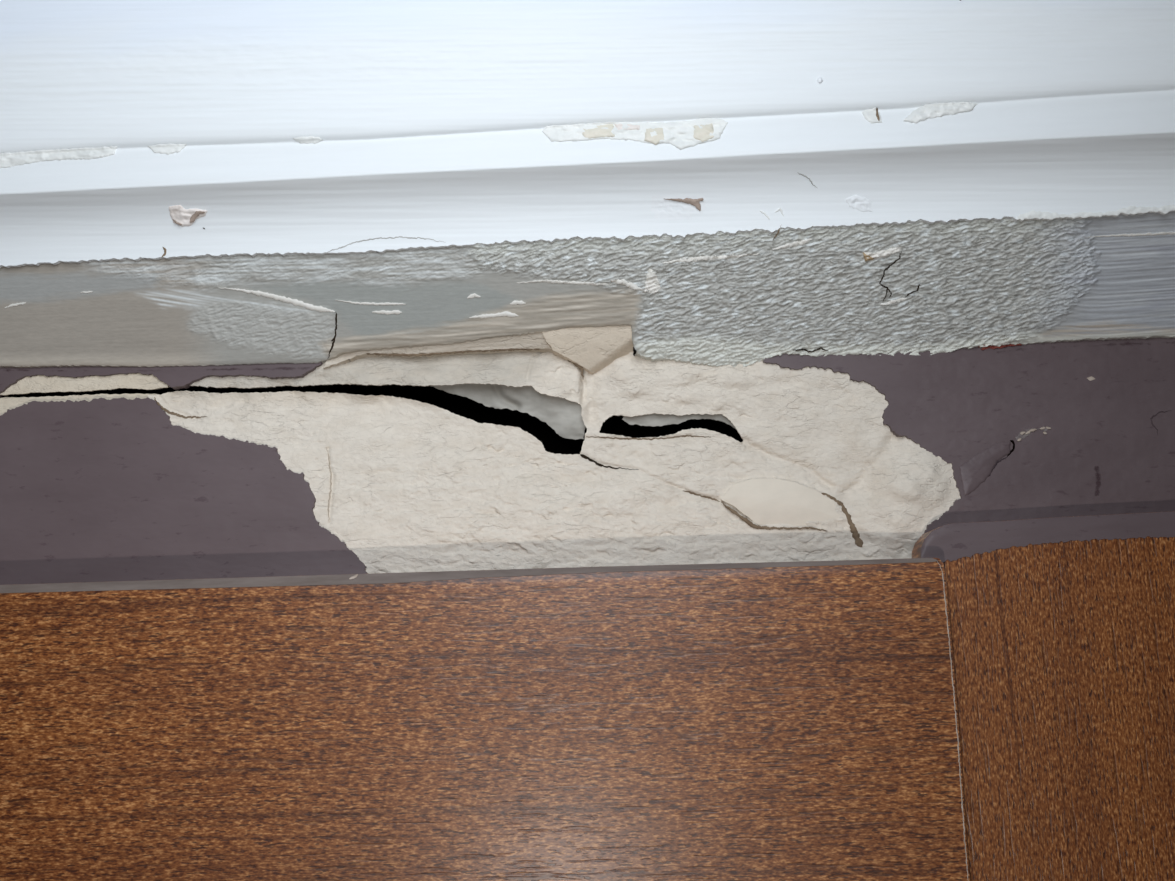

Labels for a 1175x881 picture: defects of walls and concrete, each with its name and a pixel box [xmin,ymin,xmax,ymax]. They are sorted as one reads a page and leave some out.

peeling [542,118,728,150]
peeling [644,269,661,293]
peeling [862,246,902,262]
flaking render [0,326,961,574]
crack [325,449,333,519]
crack [684,491,863,547]
spalling [937,561,969,881]